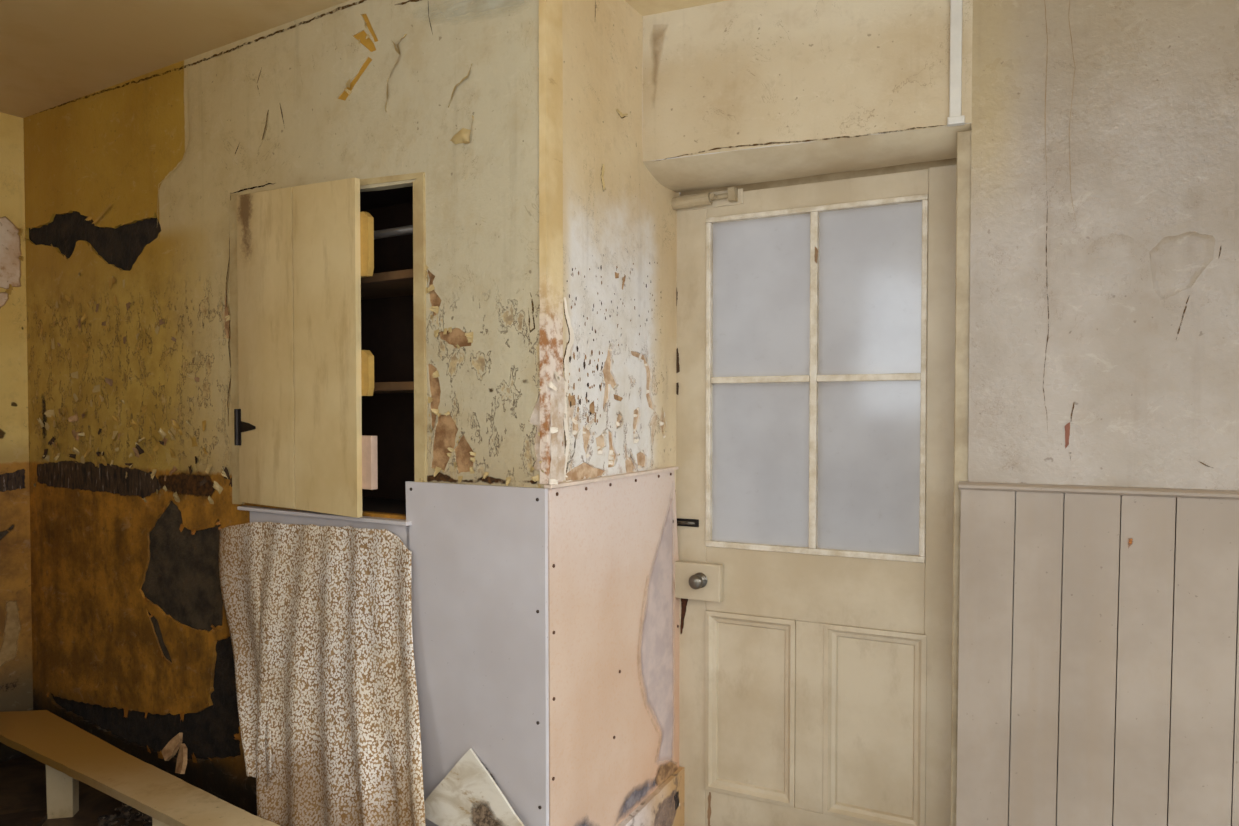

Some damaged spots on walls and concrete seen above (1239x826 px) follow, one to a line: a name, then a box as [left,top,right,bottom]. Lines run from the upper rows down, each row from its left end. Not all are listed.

crack [33,0,433,154]
flaking render [0,211,241,763]
crack [224,240,232,426]
crack [230,183,275,200]
flaking render [425,265,473,349]
flaking render [428,364,476,474]
peeling [548,262,667,485]
crack [1043,0,1077,431]
damp [620,501,677,817]
peeling [654,791,680,826]